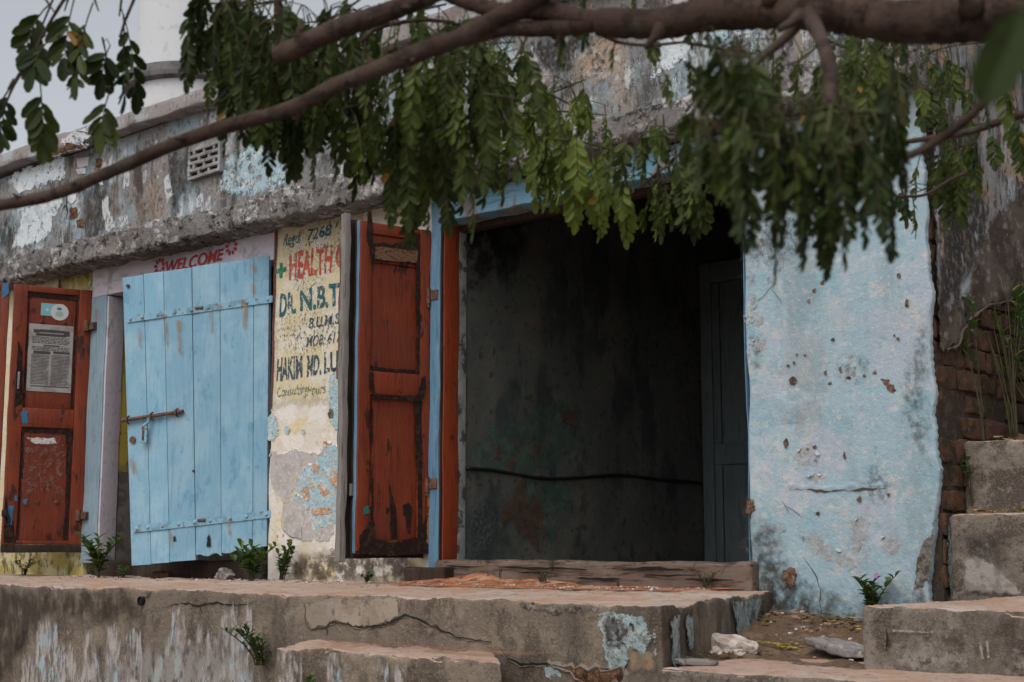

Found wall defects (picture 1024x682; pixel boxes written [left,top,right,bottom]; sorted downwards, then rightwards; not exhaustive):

peeling [8,125,102,195]
peeling [219,144,294,198]
peeling [11,192,84,250]
peeling [823,366,896,393]
leakage [905,345,924,441]
peeling [267,371,338,543]
flaking render [781,566,797,588]
peeling [963,556,1021,595]
crack [304,605,563,668]
peeling [519,602,656,682]